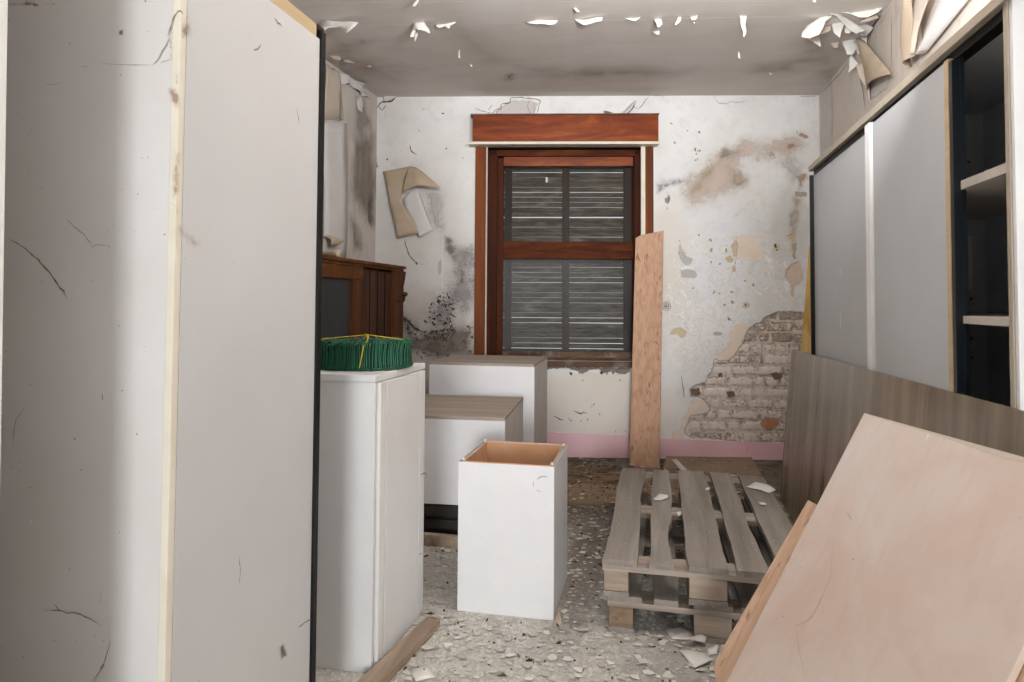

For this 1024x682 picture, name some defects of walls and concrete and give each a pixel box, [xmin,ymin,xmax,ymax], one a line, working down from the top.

peeling [320,20,358,33]
peeling [410,22,456,41]
peeling [574,8,603,25]
peeling [802,8,882,105]
leakage [354,106,374,222]
leakage [403,238,474,359]
spalling [678,244,696,308]
flaking render [697,232,804,297]
spalling [547,367,630,375]
flaking render [670,291,804,443]